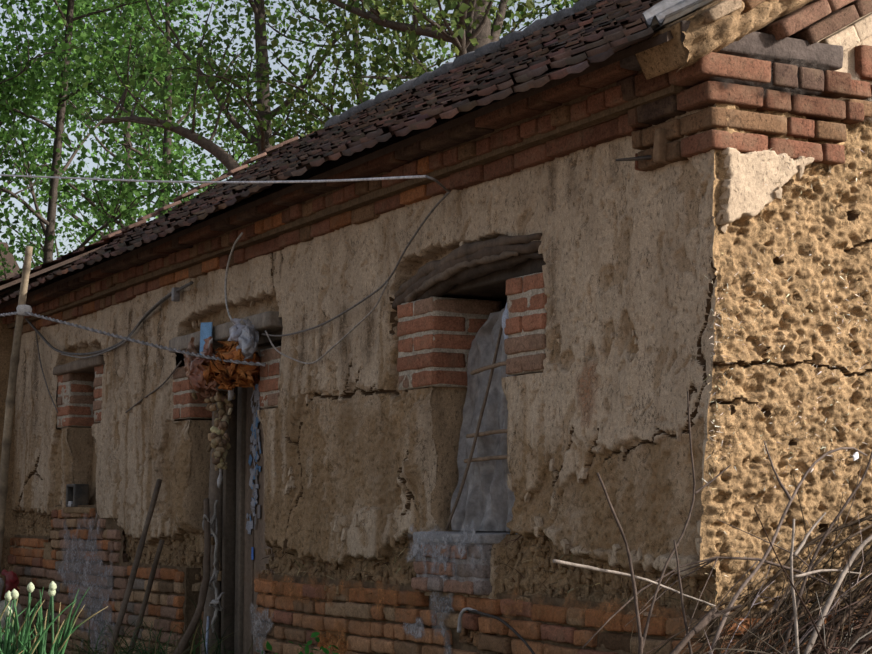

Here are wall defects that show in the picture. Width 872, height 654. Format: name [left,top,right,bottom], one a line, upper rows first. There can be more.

peeling [715,147,814,233]
crack [844,239,872,252]
crack [552,257,872,487]
crack [18,453,43,507]